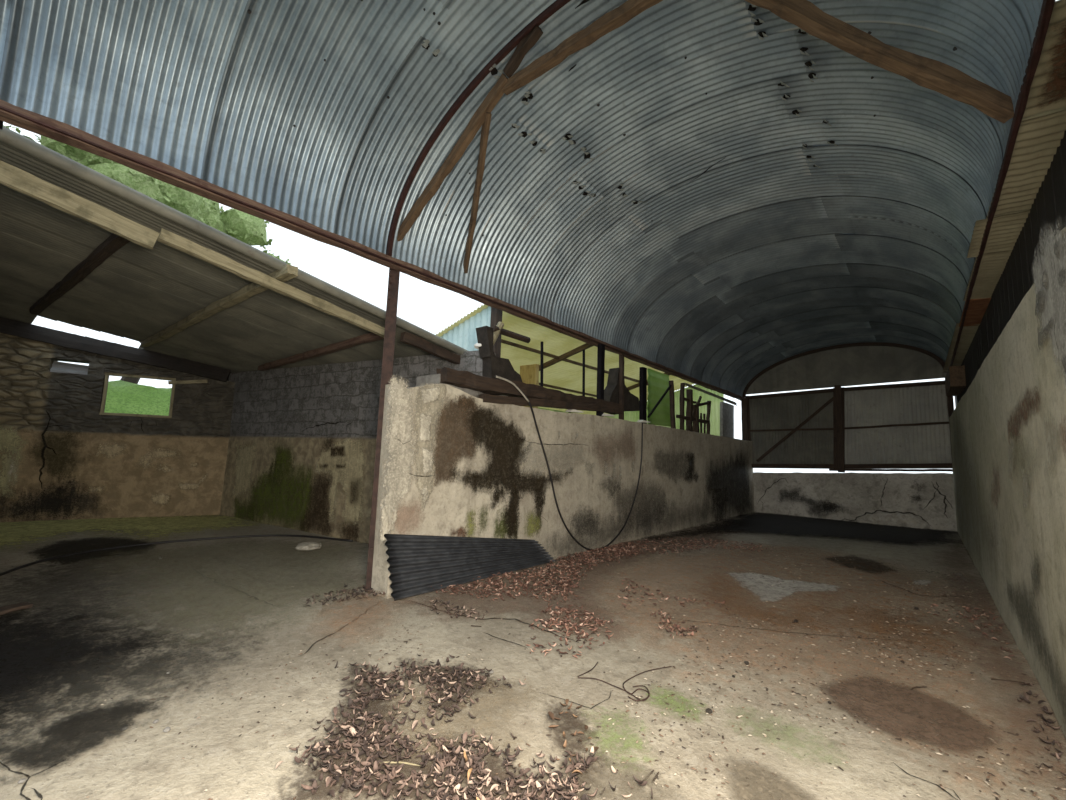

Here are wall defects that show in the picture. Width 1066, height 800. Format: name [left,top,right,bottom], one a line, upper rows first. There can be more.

damp [0,480,99,521]
crack [39,411,69,489]
damp [300,473,359,542]
damp [433,396,572,539]
damp [648,452,961,545]
crack [841,478,953,526]
rust [1008,392,1039,443]
damp [827,556,895,572]
damp [0,537,196,728]
damp [823,677,994,751]
crack [0,761,62,800]